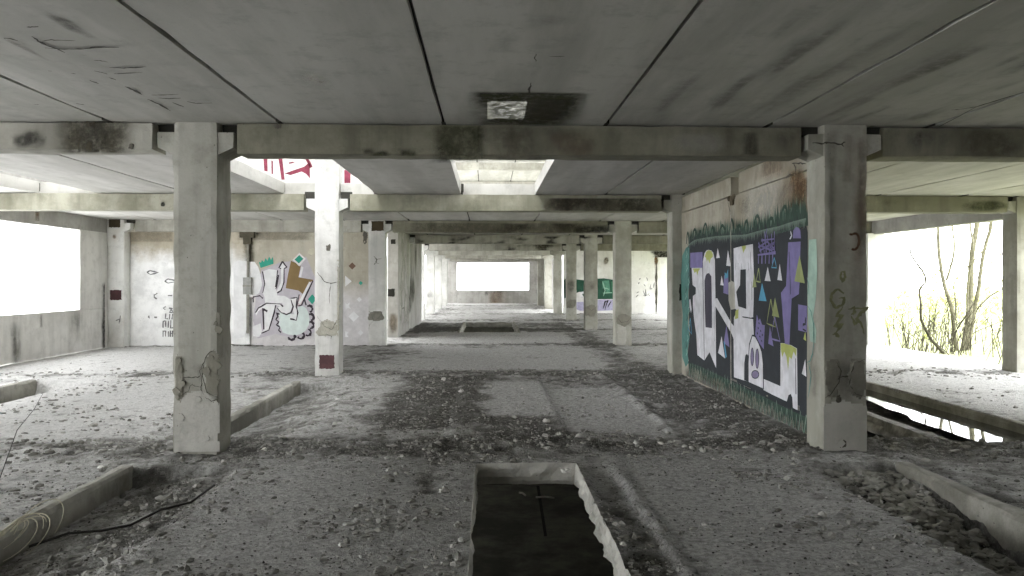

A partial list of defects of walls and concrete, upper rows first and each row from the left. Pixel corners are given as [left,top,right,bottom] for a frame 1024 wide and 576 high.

water stain [64,121,125,153]
water stain [439,93,580,161]
crack [786,142,845,177]
spalling [316,244,341,337]
peeling [172,350,222,452]
peeling [824,359,867,452]